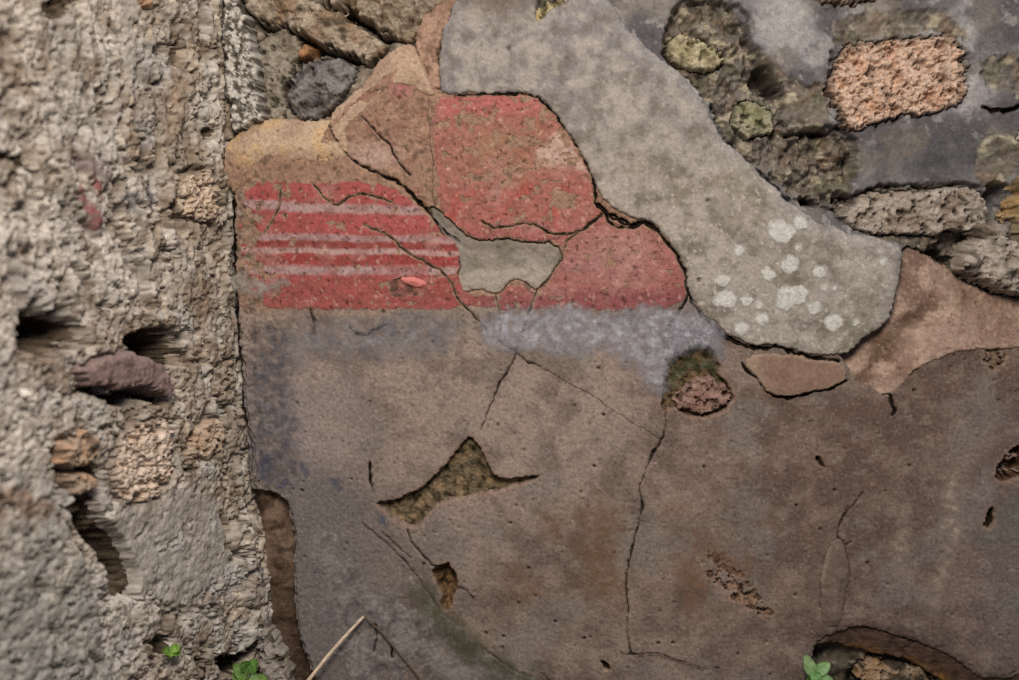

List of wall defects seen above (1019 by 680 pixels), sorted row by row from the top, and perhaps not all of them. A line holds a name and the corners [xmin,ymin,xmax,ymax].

crack [313,99,460,241]
crack [364,92,848,670]
spalling [983,349,1002,370]
spalling [379,437,537,525]
spalling [995,445,1019,481]
spalling [983,507,993,528]
spalling [434,563,458,609]
spalling [706,550,773,616]